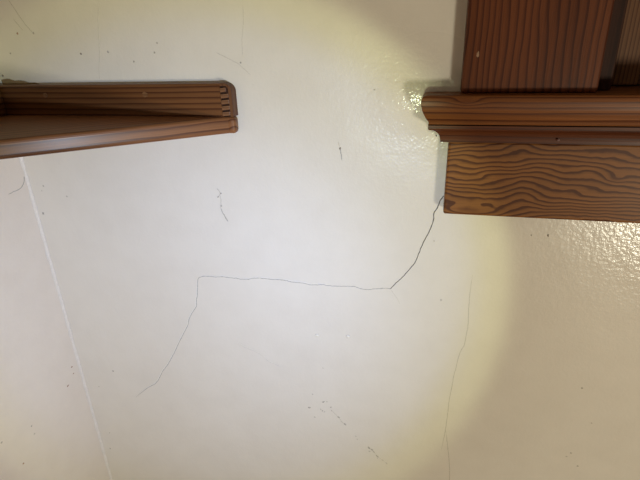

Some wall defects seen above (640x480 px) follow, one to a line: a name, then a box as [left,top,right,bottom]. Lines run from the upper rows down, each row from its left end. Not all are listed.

crack [135,196,444,397]